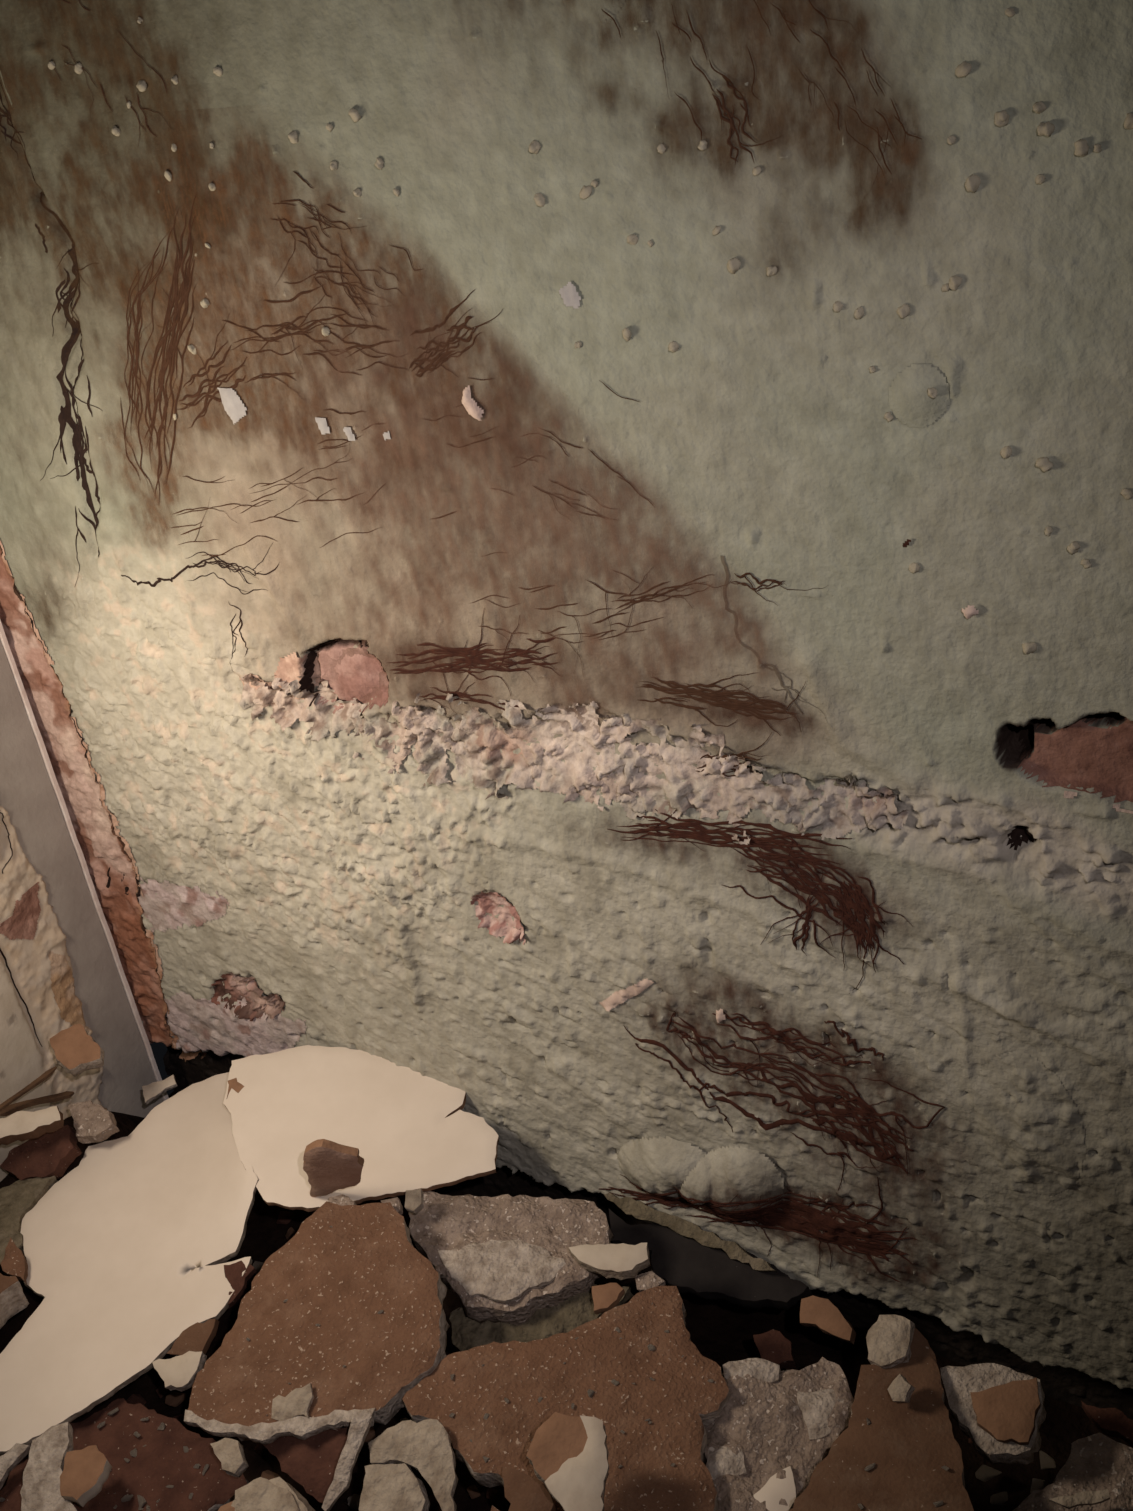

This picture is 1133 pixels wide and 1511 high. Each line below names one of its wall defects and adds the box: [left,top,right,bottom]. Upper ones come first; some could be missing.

crack [0,83,279,672]
peeling [217,388,247,425]
rust [611,567,827,614]
rust [388,611,557,714]
flaking render [0,541,307,1062]
flaking render [239,638,909,845]
rust [639,673,811,777]
flaking render [1017,712,1133,814]
flaking render [470,892,526,945]
rust [608,809,911,994]
rust [599,982,945,1283]